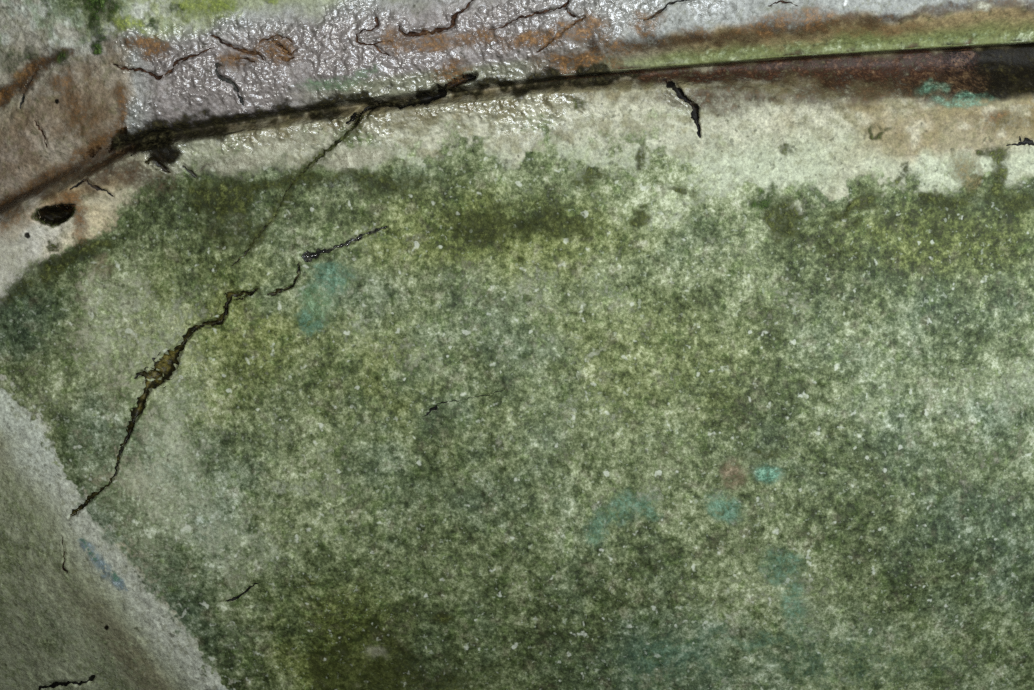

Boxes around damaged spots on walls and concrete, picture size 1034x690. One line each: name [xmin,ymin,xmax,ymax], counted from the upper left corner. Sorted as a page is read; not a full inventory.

rust [126,36,169,56]
crack [113,35,296,106]
crack [356,0,473,57]
rust [383,29,493,51]
rust [512,16,629,74]
leakage [0,40,1034,217]
crack [663,78,701,138]
spalling [31,203,75,228]
leakage [189,134,322,244]
crack [232,73,476,266]
crack [62,226,387,573]
leakage [754,467,780,481]